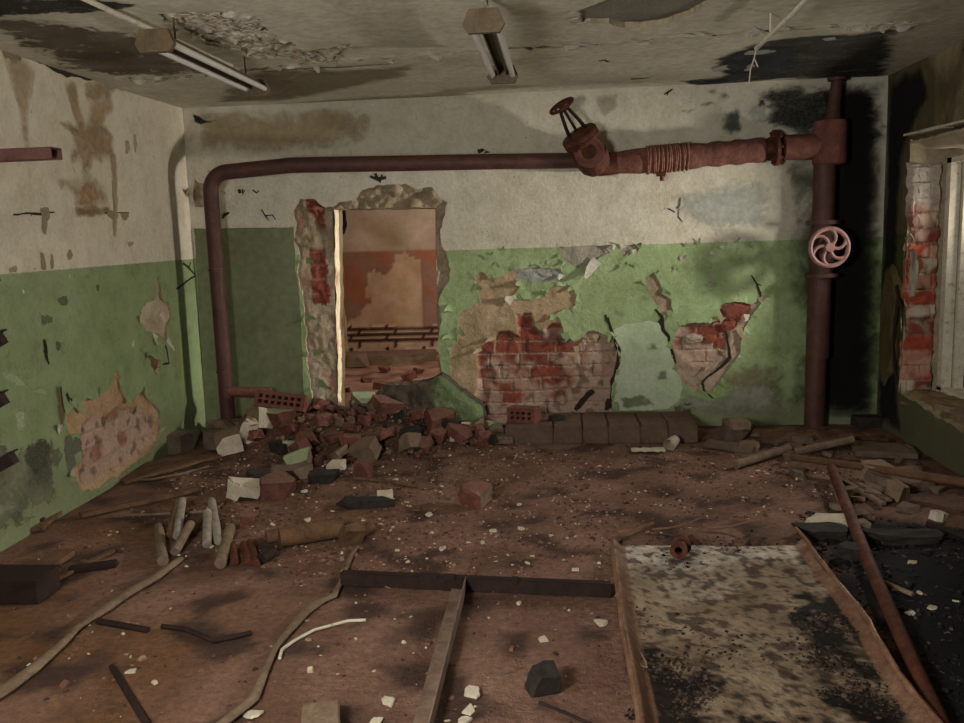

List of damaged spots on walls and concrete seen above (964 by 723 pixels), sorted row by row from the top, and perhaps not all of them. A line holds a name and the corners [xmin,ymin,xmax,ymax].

spalling [163,10,353,64]
water stain [64,82,118,235]
peeling [140,274,176,351]
spalling [294,184,642,424]
spalling [642,270,769,391]
water stain [0,439,62,529]
spalling [57,371,166,491]